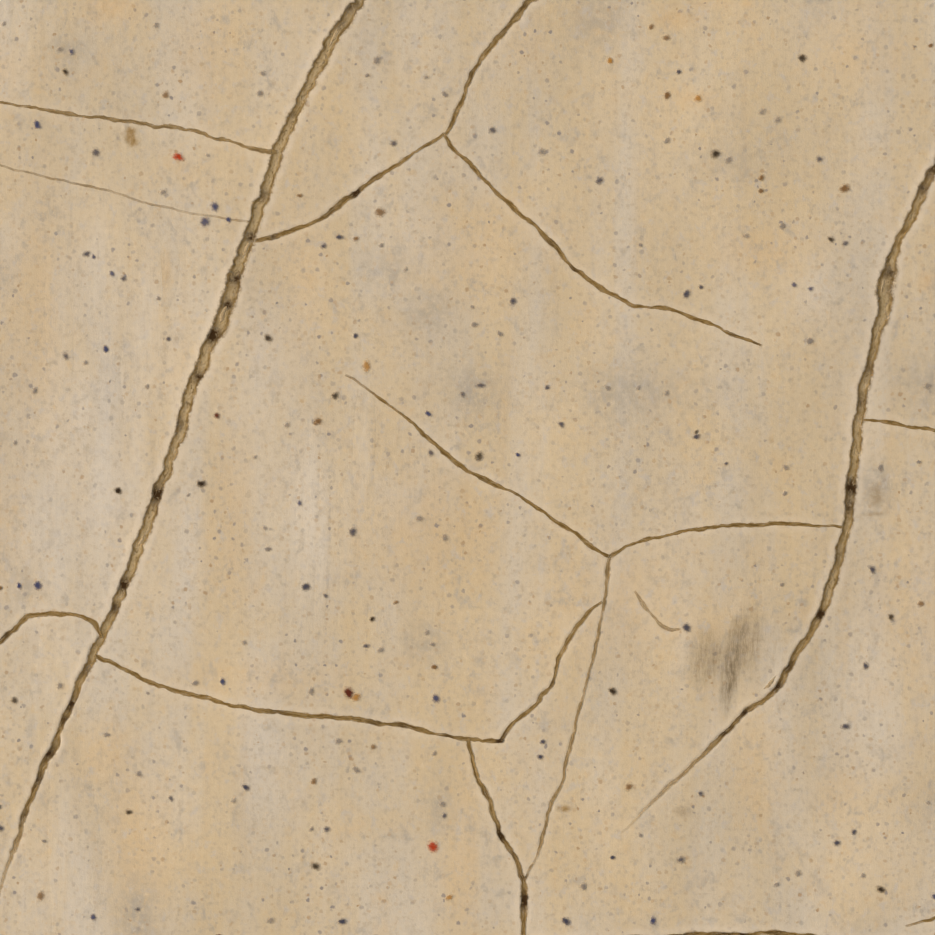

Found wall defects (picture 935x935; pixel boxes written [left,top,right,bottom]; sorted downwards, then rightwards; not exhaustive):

crack [444,0,761,346]
crack [0,0,602,935]
crack [365,164,935,801]
crack [671,927,814,935]
crack [907,916,935,926]